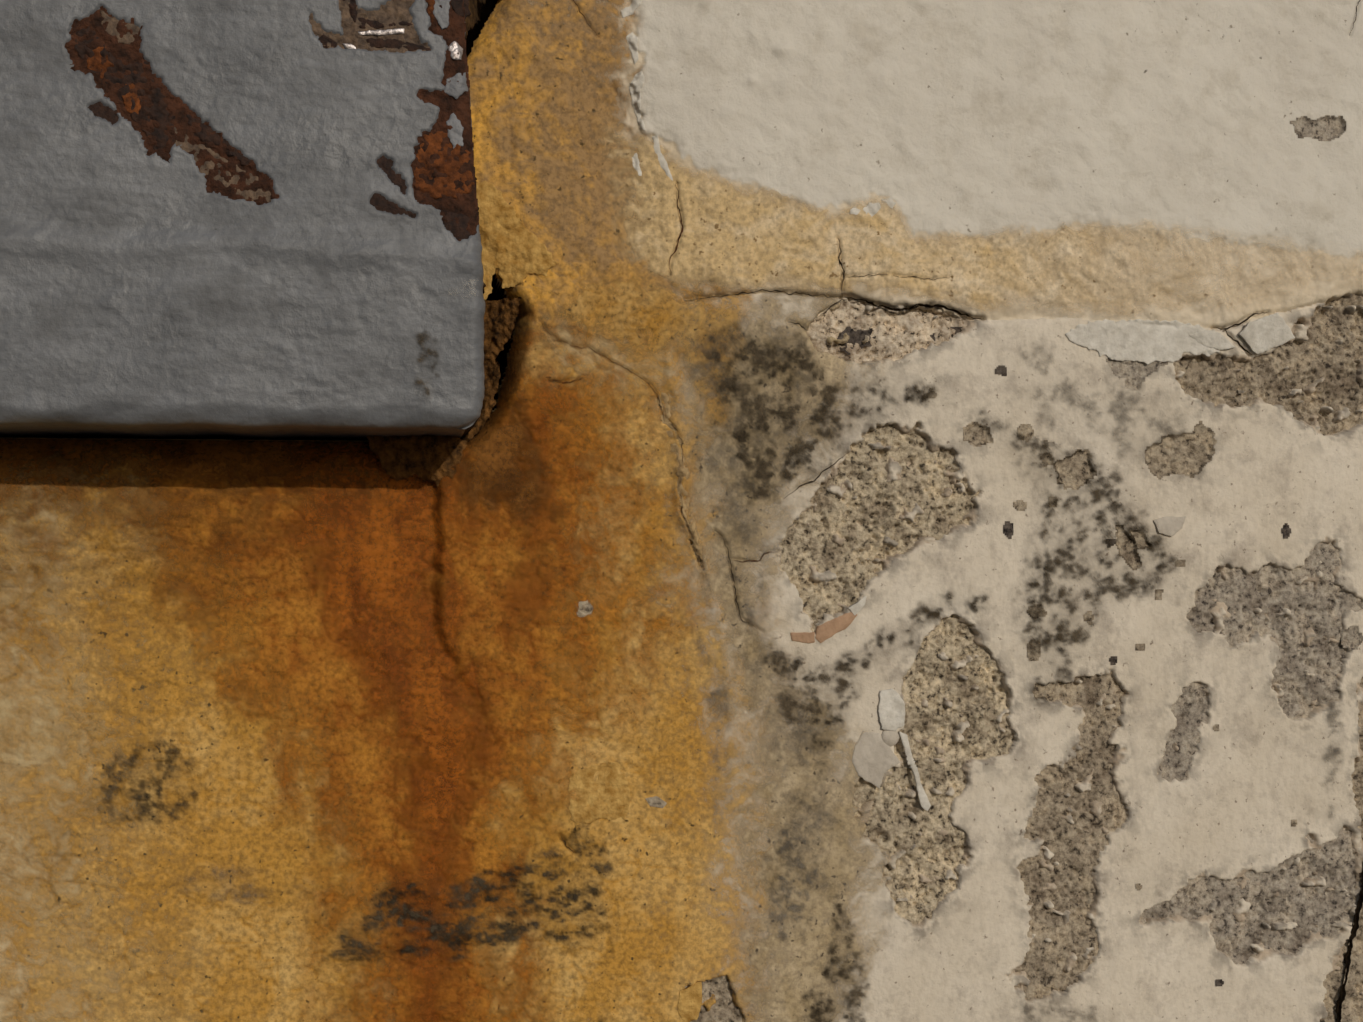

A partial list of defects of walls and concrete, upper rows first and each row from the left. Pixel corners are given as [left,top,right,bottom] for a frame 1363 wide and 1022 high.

rust [64,6,279,205]
rust [411,0,486,241]
crack [542,325,777,632]
crack [669,184,984,331]
water stain [467,0,1298,1022]
spalling [1106,294,1363,436]
water stain [0,458,395,1022]
rust [0,333,669,1022]
spalling [852,614,1014,925]
spalling [1014,656,1127,1001]
spalling [1139,677,1363,1022]
crack [1335,870,1363,1022]